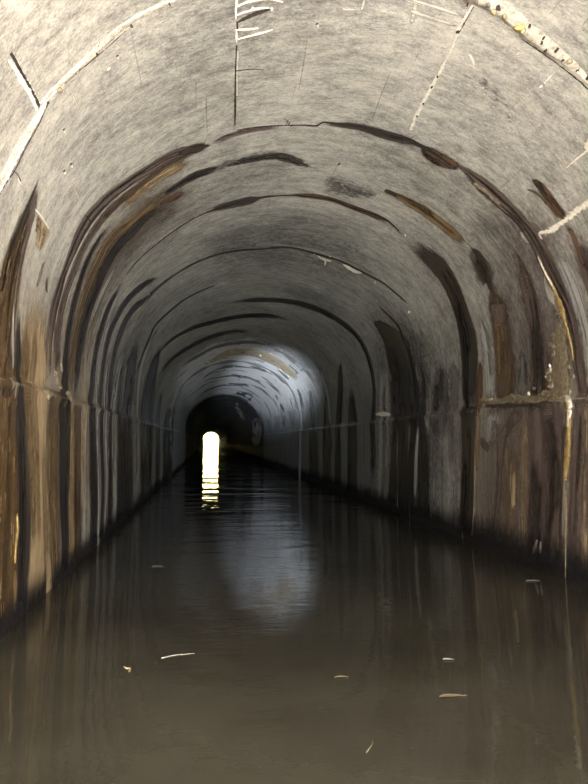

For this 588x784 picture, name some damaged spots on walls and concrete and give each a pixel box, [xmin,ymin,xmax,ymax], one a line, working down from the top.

crack [8,52,41,111]
spalling [0,0,178,194]
damp [218,126,274,141]
spalling [236,0,283,40]
crack [234,0,474,165]
spalling [455,0,588,90]